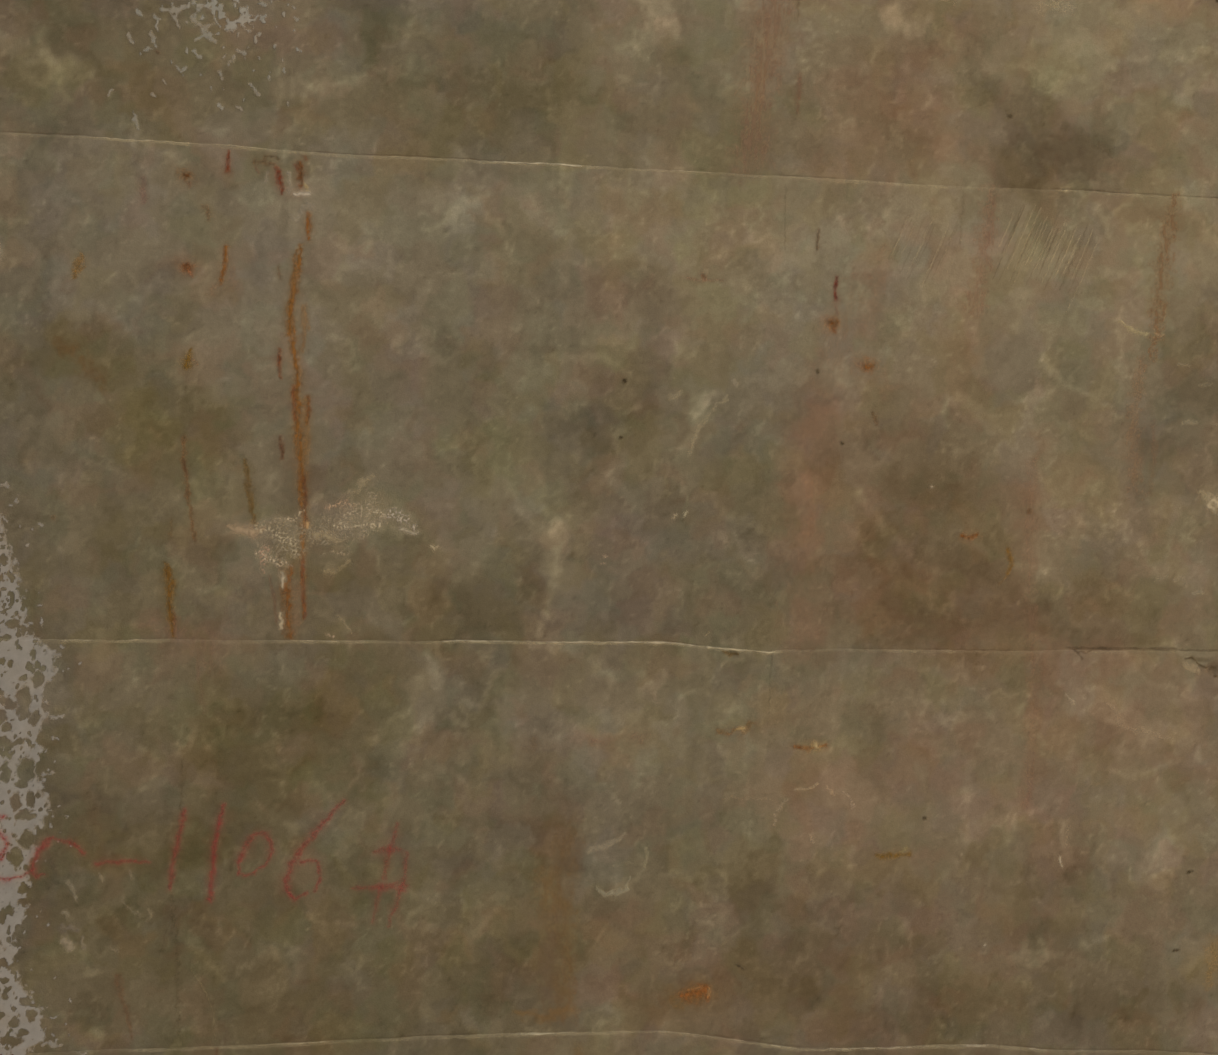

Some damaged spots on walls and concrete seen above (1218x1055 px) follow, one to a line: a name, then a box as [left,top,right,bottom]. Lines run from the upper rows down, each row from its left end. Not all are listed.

peeling [180,0,266,54]
corrosion [278,213,311,639]
water stain [235,498,415,588]
peeling [0,516,81,1055]